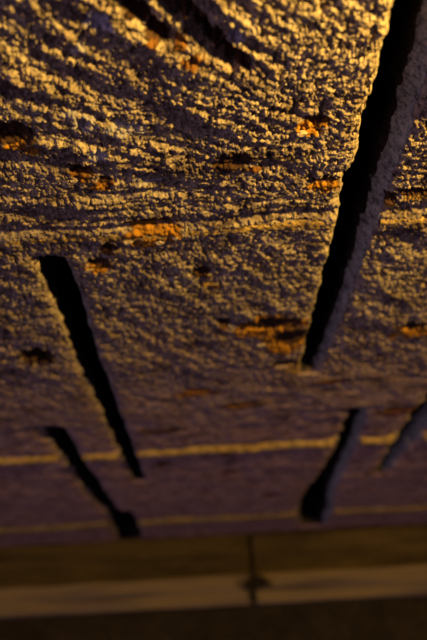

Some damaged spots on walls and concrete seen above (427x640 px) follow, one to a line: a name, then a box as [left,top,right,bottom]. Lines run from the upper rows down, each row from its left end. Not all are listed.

corrosion [234,314,309,375]